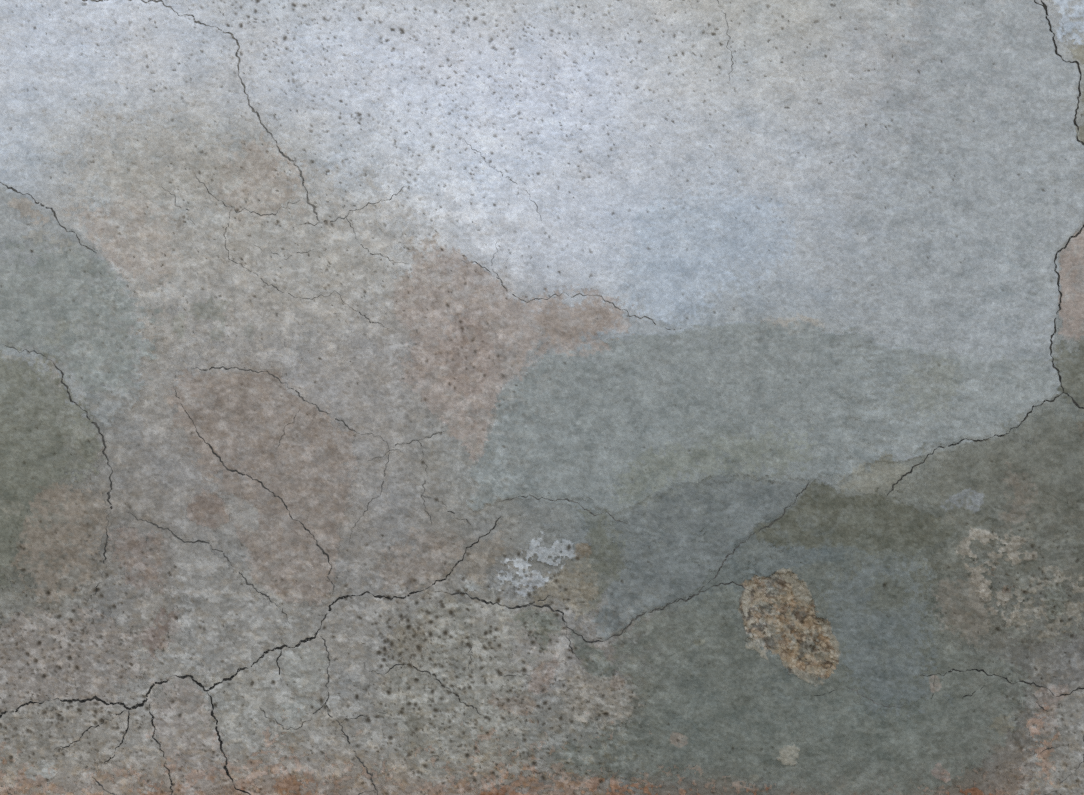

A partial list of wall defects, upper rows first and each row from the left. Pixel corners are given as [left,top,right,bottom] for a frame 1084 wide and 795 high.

crack [0,182,96,253]
peeling [0,180,358,795]
damp [0,79,464,608]
crack [129,0,410,327]
crack [0,345,809,795]
crack [462,248,681,330]
peeling [342,0,1084,795]
damp [460,373,1084,795]
crack [887,225,1084,495]
crack [922,669,1084,711]
crack [1034,0,1084,145]